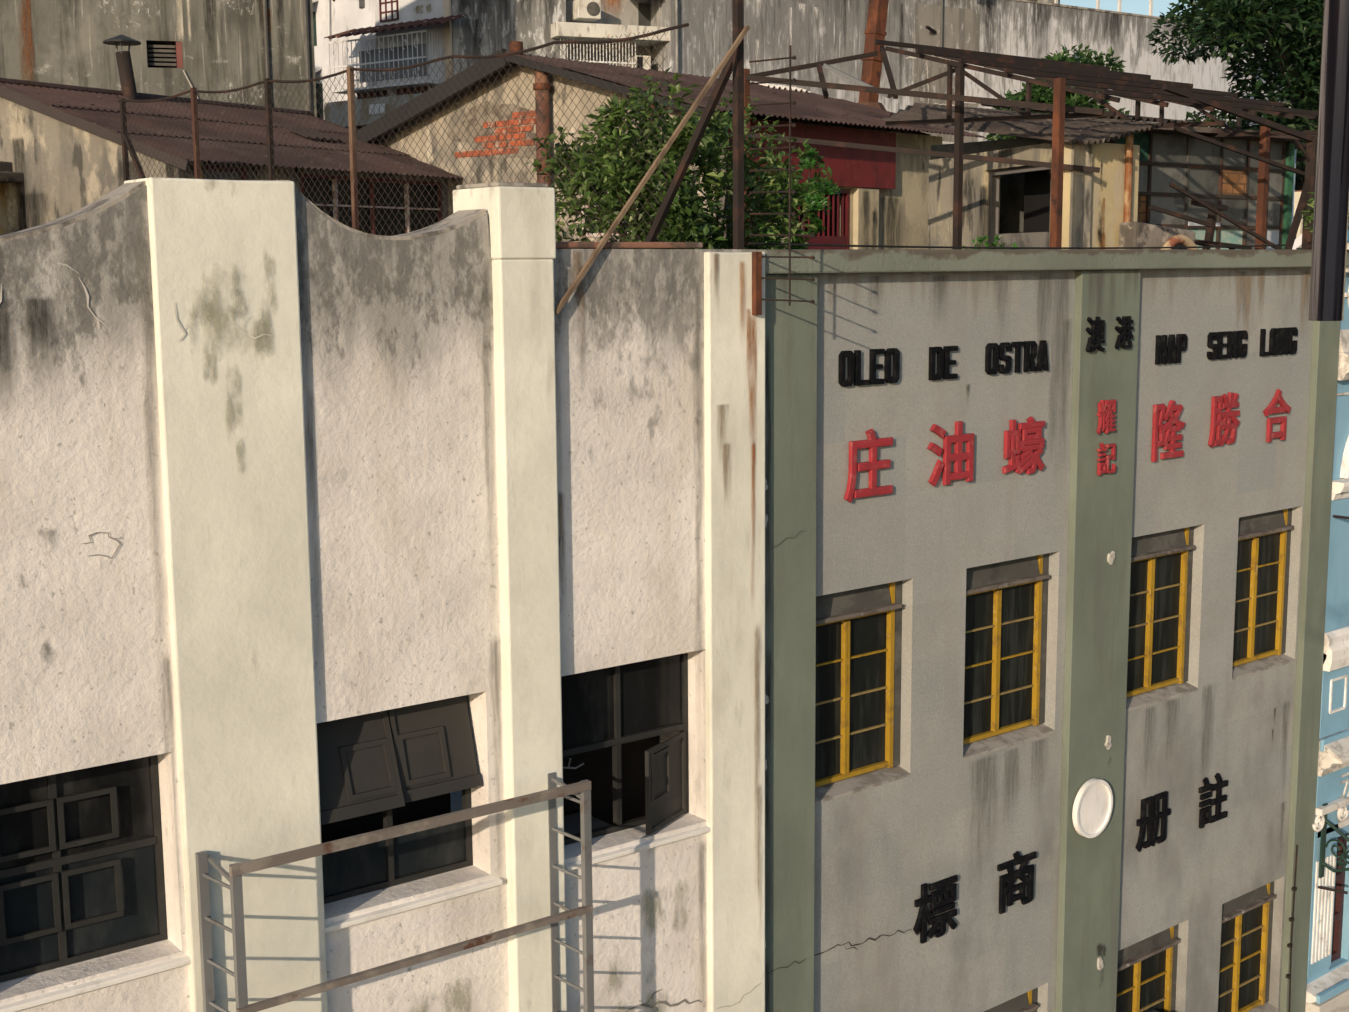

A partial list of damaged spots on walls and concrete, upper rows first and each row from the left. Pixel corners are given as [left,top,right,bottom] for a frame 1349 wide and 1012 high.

damp [176,0,228,42]
damp [246,0,283,47]
spalling [447,101,536,160]
damp [27,299,52,346]
corrosion [740,263,756,370]
crack [625,929,912,1012]